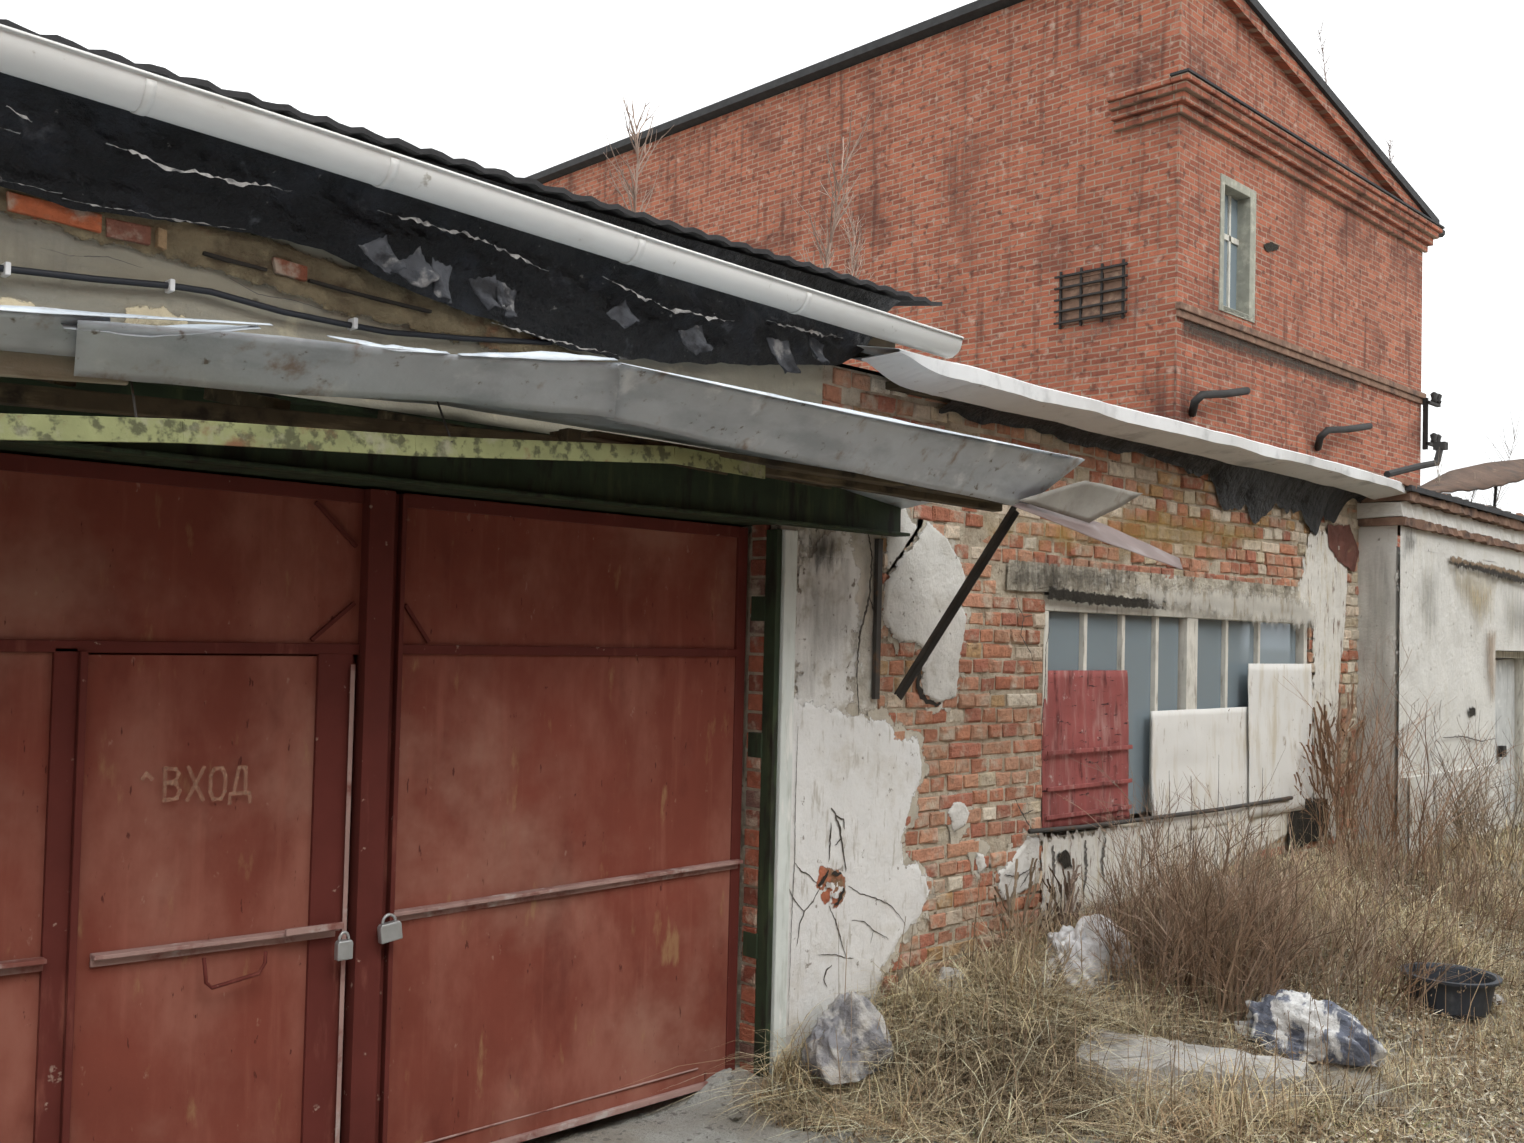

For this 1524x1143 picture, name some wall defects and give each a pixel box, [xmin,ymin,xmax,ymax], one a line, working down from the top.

flaking render [0,186,582,361]
crack [788,733,904,1026]
peeling [785,527,936,1064]